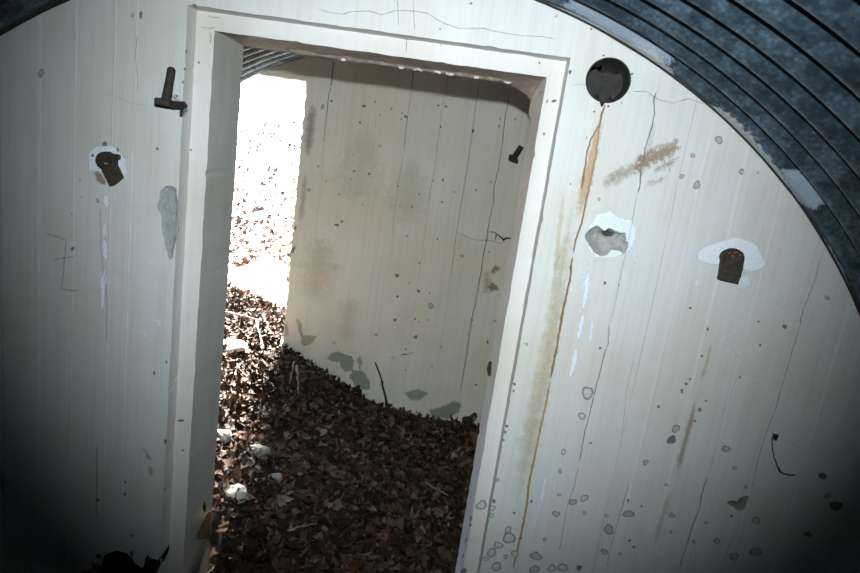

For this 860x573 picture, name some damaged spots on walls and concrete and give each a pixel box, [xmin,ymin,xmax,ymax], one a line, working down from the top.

crack [638,94,656,192]
corrosion [638,142,678,169]
peeling [157,185,180,260]
crack [460,97,509,386]
spalling [585,225,629,256]
corrosion [720,248,745,277]
corrosion [513,94,612,568]
crack [579,335,609,460]